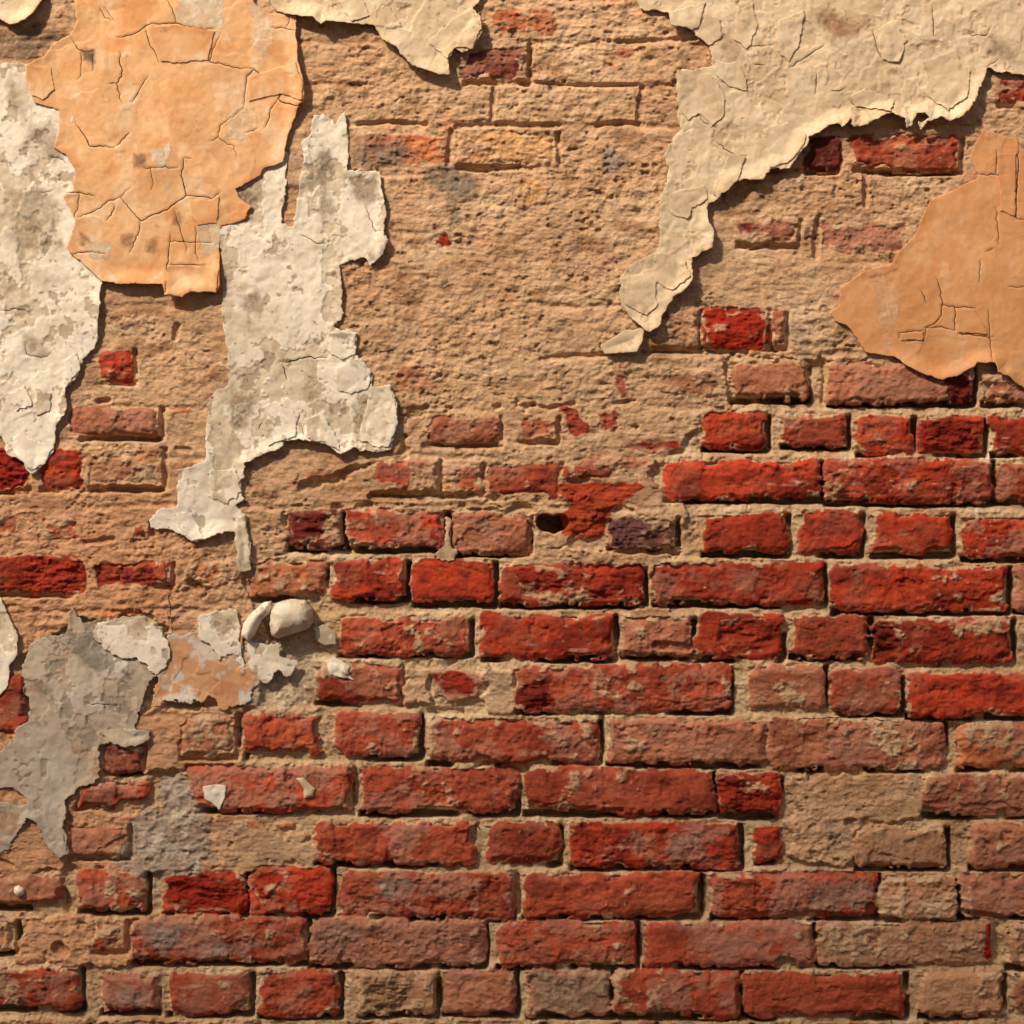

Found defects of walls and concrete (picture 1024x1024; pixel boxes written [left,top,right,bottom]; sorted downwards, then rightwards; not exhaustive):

crack [72,1,304,152]
crack [791,45,865,108]
crack [41,157,220,290]
peeling [0,0,482,573]
peeling [601,0,1024,354]
peeling [831,129,1024,454]
crack [899,283,992,357]
crack [979,145,1021,279]
peeling [314,624,353,680]
peeling [0,597,298,859]
peeling [296,777,315,798]